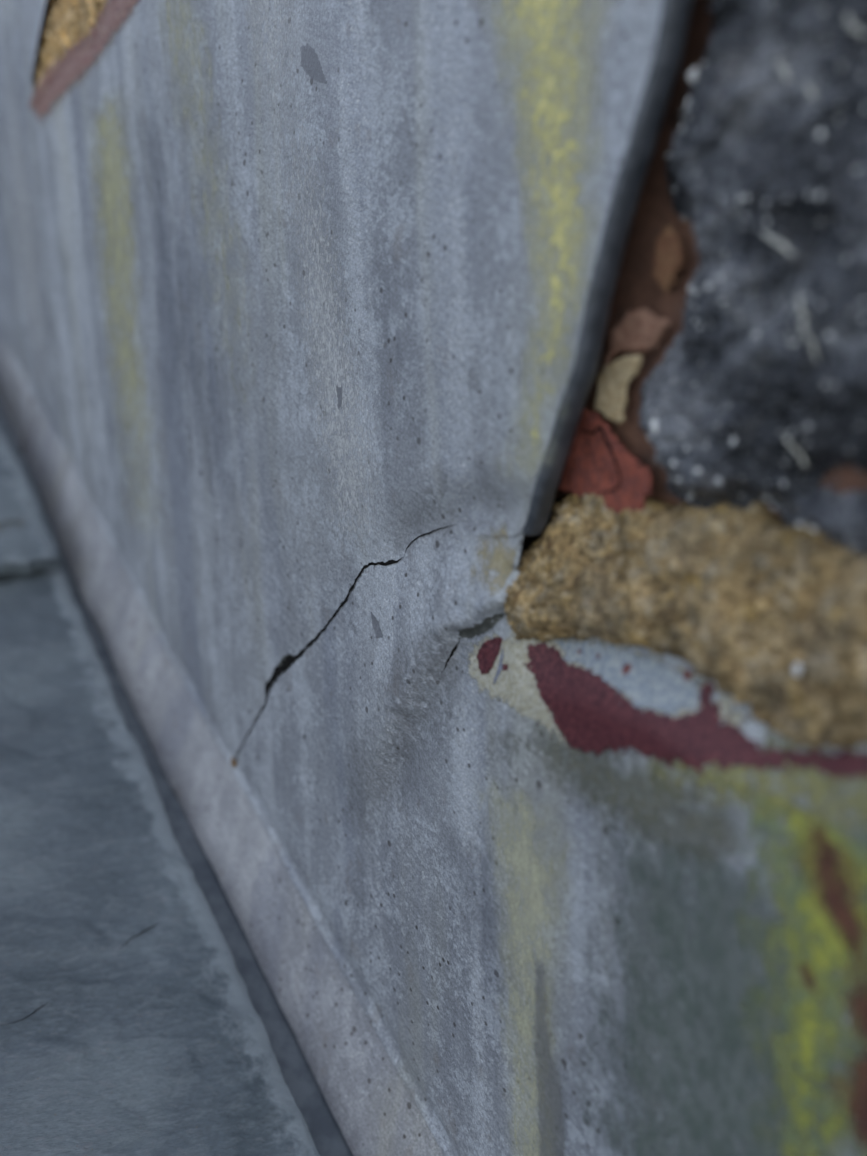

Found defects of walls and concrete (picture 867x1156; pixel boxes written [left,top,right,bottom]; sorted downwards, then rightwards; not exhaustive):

peeling [30,0,139,120]
leakage [495,0,597,467]
spalling [652,224,685,293]
spalling [558,307,671,513]
crack [236,525,453,760]
peeling [469,631,867,780]